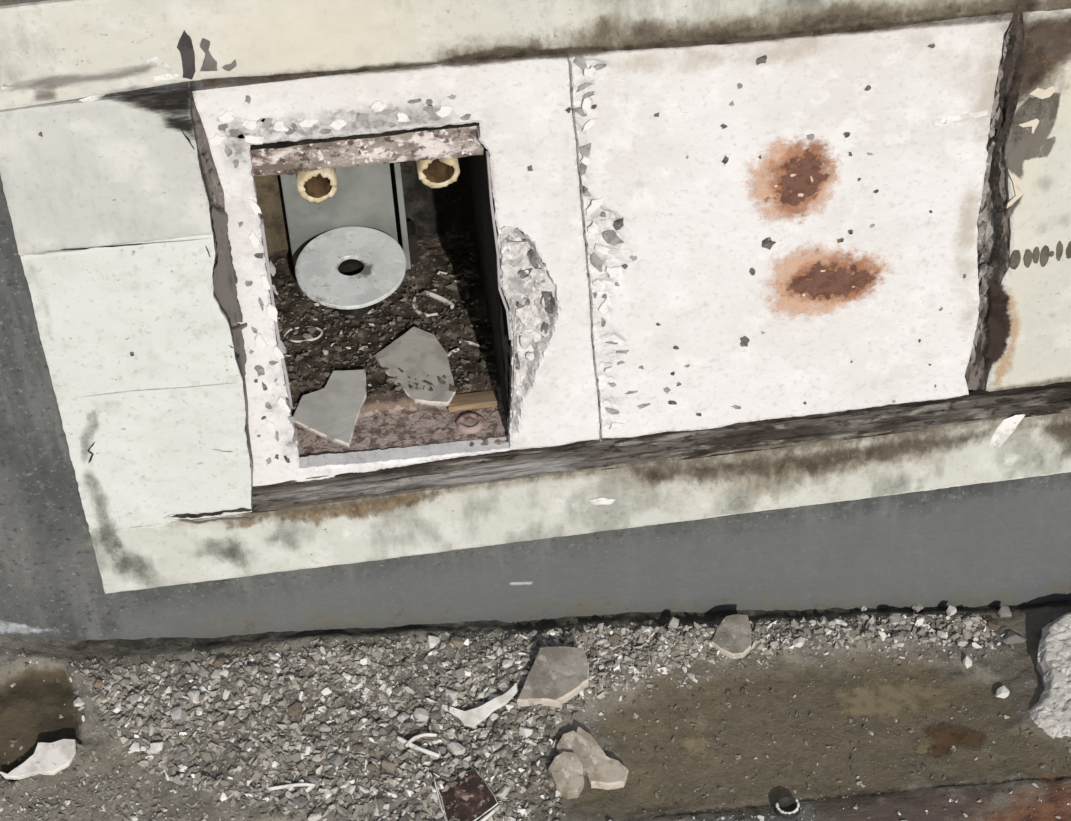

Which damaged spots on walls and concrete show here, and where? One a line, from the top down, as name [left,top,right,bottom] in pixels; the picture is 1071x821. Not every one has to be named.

spalling [153,30,237,82]
corrosion [752,142,837,219]
peeling [1005,85,1060,218]
crack [33,0,1036,442]
corrosion [769,250,885,315]
spalling [501,226,558,433]
water stain [647,433,985,481]
water stain [1045,425,1071,454]